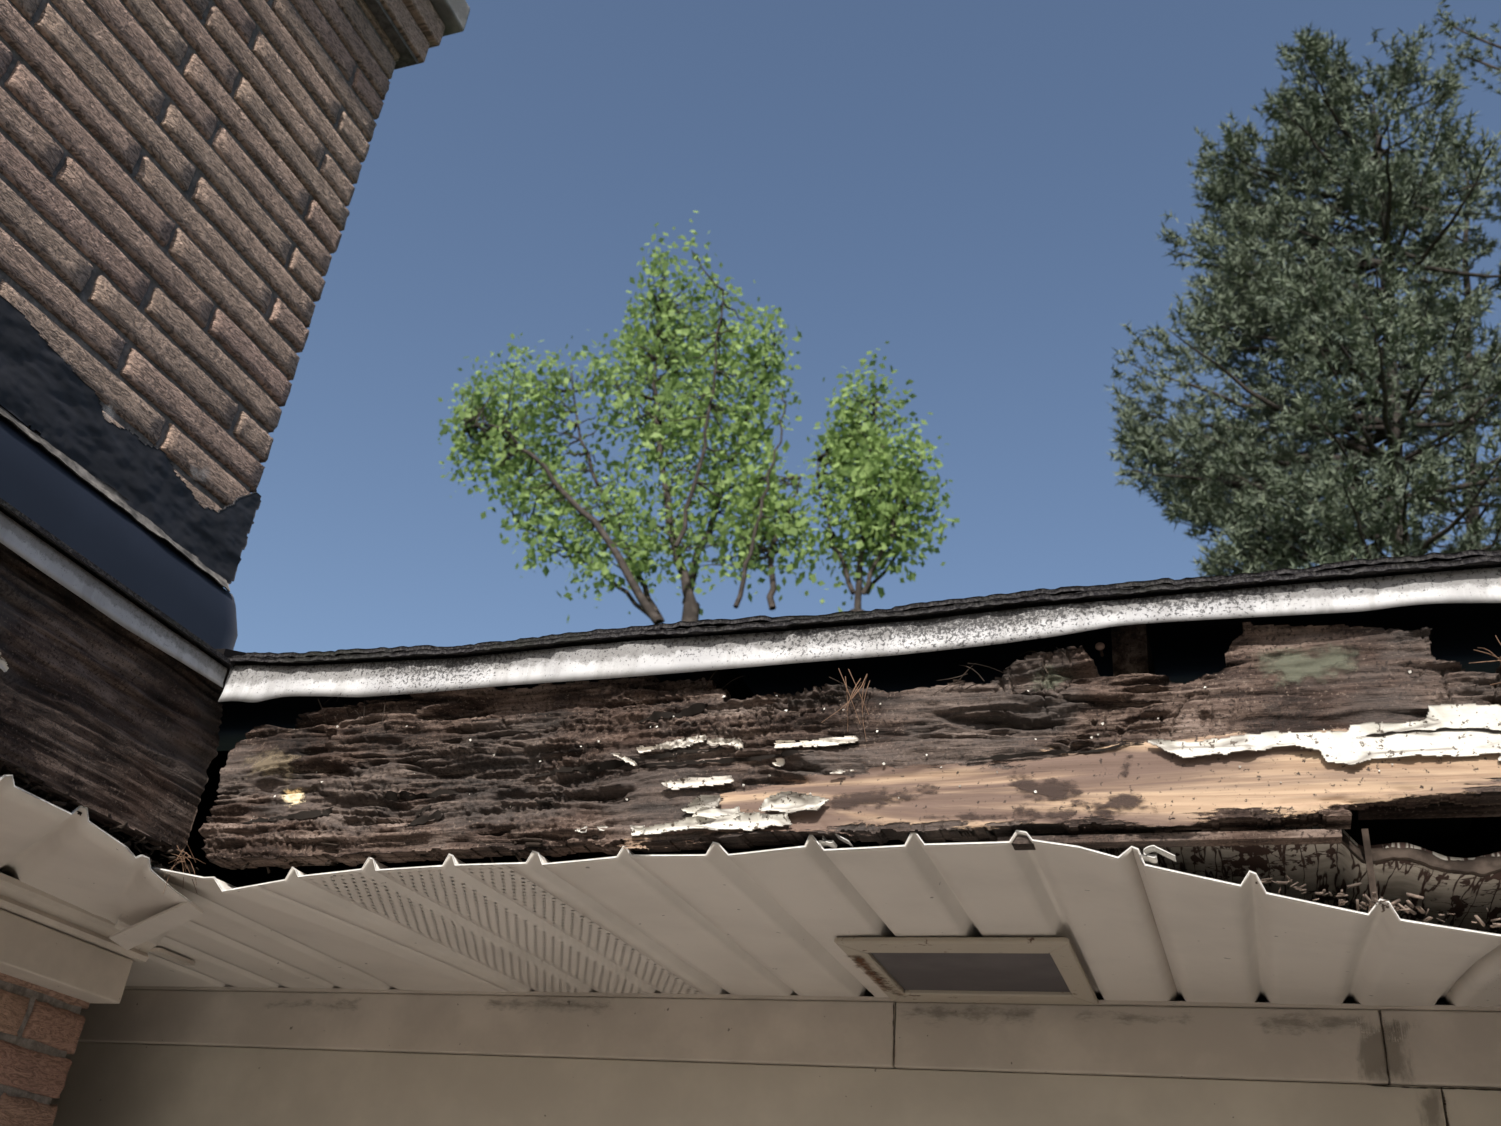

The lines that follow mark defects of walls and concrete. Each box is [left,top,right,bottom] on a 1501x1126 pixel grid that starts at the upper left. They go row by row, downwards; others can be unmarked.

peeling [612,703,1501,849]